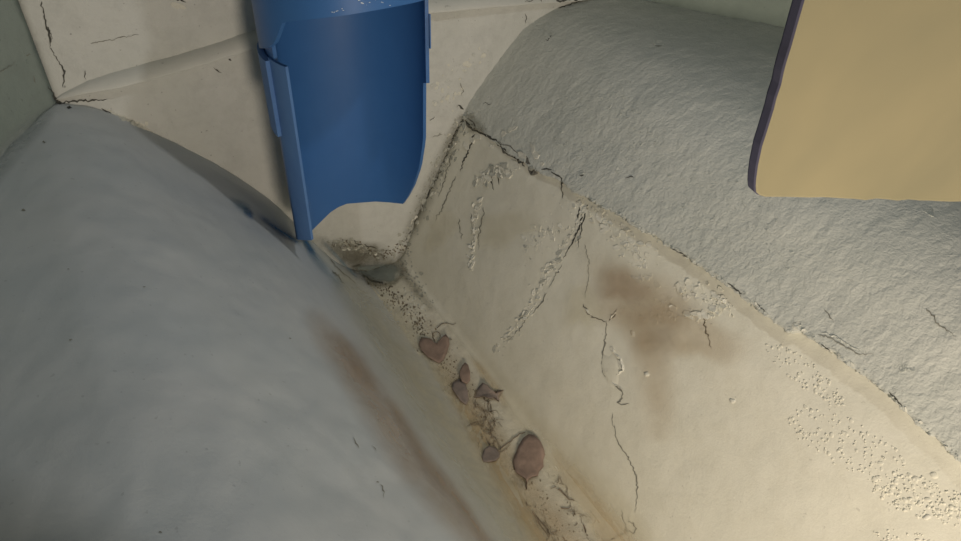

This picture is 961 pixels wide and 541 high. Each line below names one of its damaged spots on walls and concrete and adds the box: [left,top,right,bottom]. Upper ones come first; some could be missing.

crack [40,2,154,132]
peeling [327,105,475,311]
peeling [458,163,517,271]
crack [462,118,584,198]
crack [583,246,638,541]